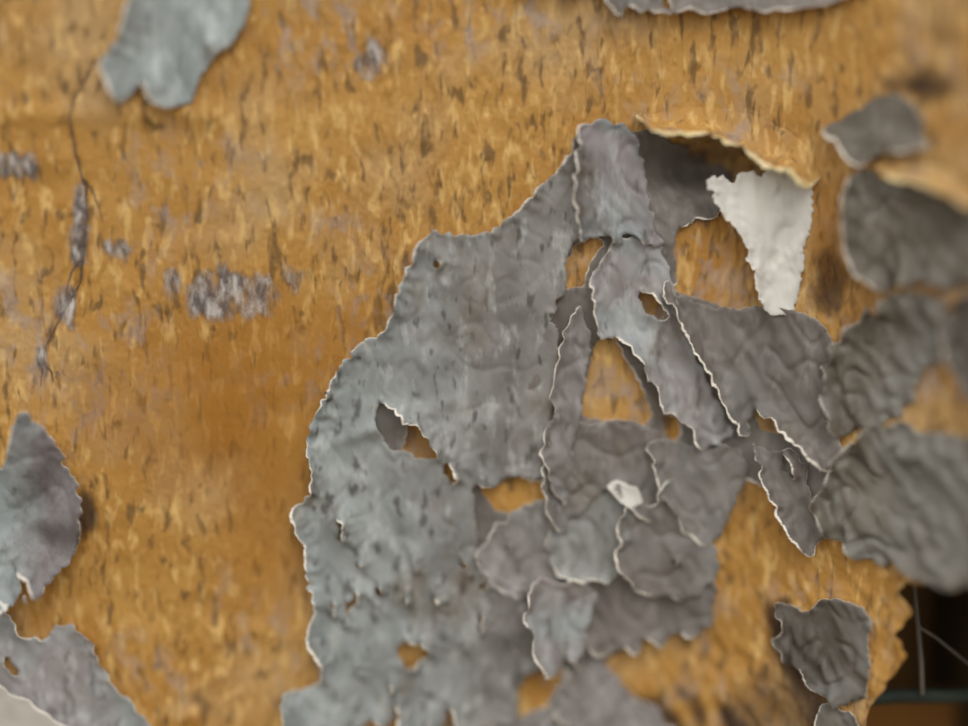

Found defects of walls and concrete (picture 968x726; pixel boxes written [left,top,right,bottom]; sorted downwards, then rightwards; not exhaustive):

peeling [99,0,250,108]
crack [40,58,103,386]
peeling [280,93,968,726]
peeling [0,412,82,614]
peeling [0,685,65,726]